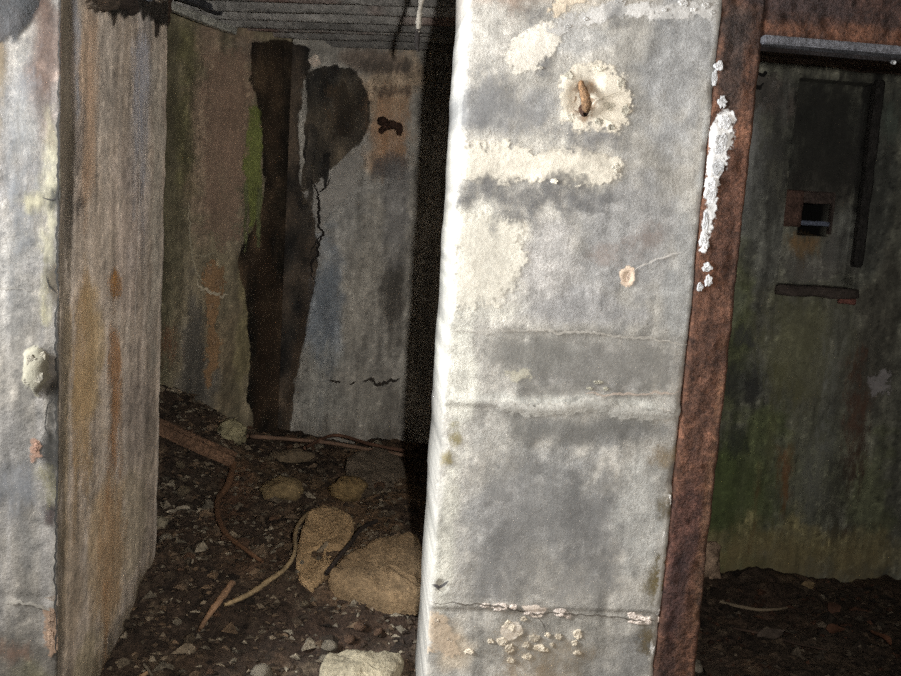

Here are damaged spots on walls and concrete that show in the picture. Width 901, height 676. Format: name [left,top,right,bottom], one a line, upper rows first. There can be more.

water stain [0,0,48,42]
spalling [86,0,123,13]
water stain [238,39,370,433]
water stain [24,0,79,675]
crack [329,377,399,387]
crack [432,581,658,637]